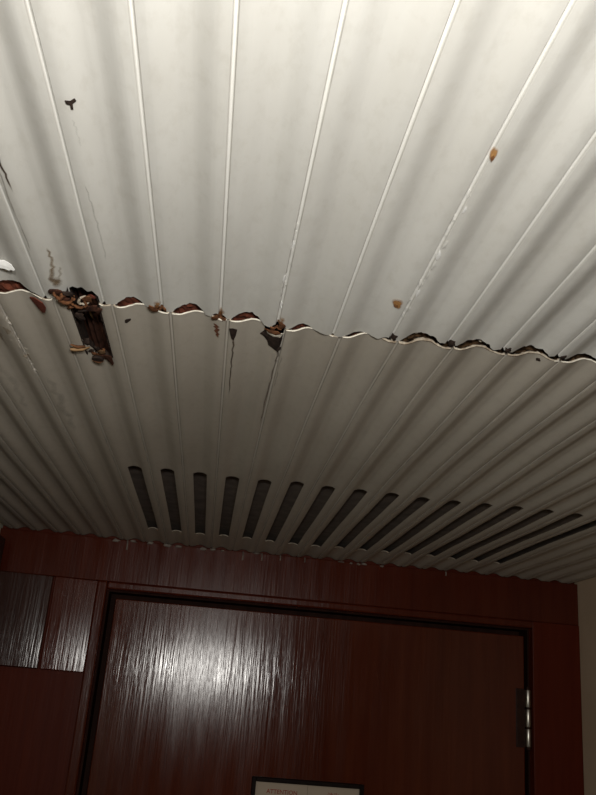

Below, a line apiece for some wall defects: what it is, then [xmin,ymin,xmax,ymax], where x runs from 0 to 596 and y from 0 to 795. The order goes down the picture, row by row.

crack [0,280,66,313]
peeling [48,289,102,313]
peeling [260,322,289,352]
crack [88,294,596,364]